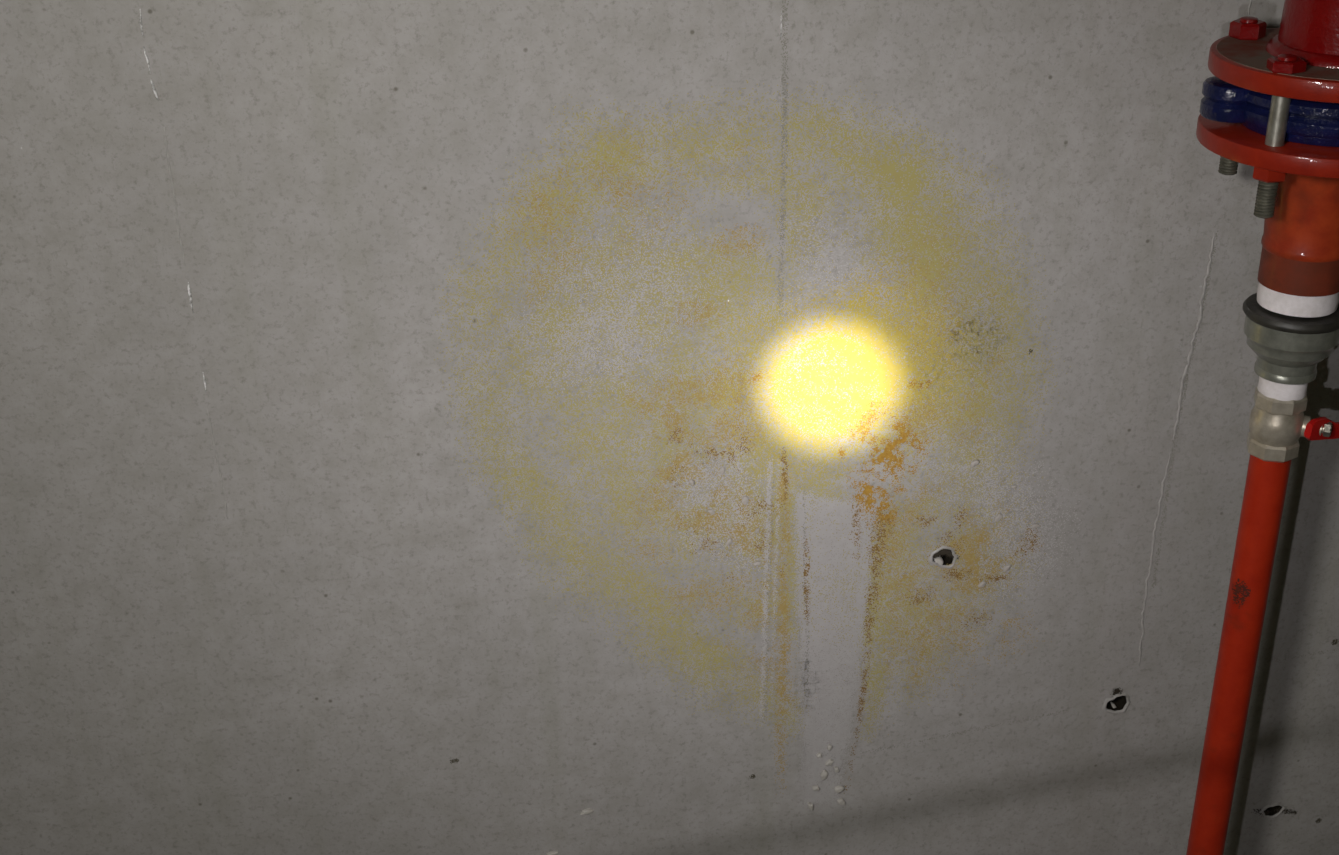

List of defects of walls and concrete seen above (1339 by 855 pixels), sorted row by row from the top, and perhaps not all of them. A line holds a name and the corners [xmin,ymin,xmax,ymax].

crack [777,0,789,315]
water stain [434,80,1071,810]
crack [758,458,810,726]
rust [838,400,935,678]